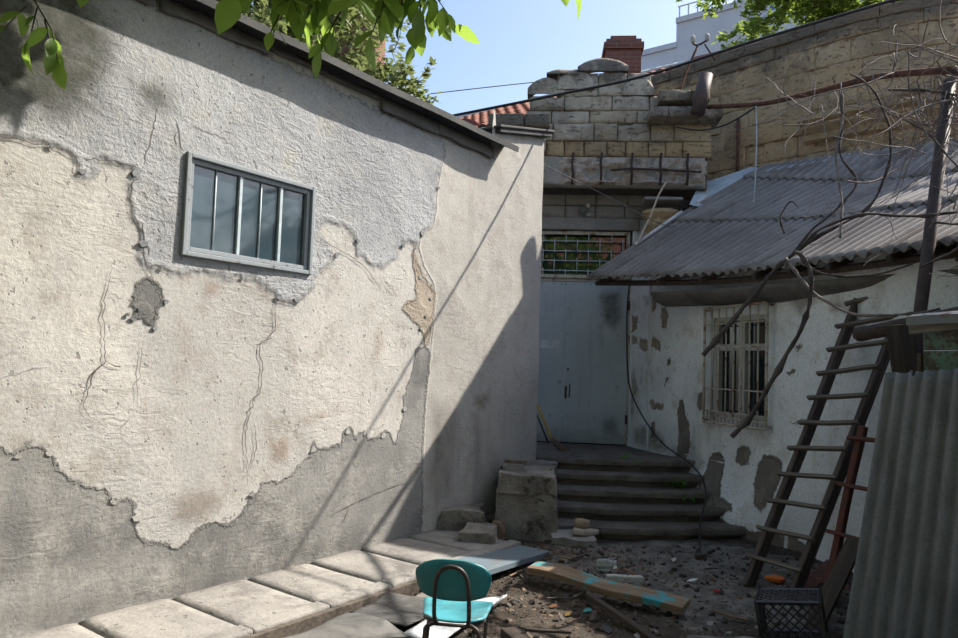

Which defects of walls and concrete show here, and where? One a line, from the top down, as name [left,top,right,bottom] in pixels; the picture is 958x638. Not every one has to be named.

crack [0,107,235,278]
crack [83,265,189,439]
peeling [0,0,445,638]
crack [245,280,305,488]
peeling [676,398,690,459]
peeling [698,445,782,541]